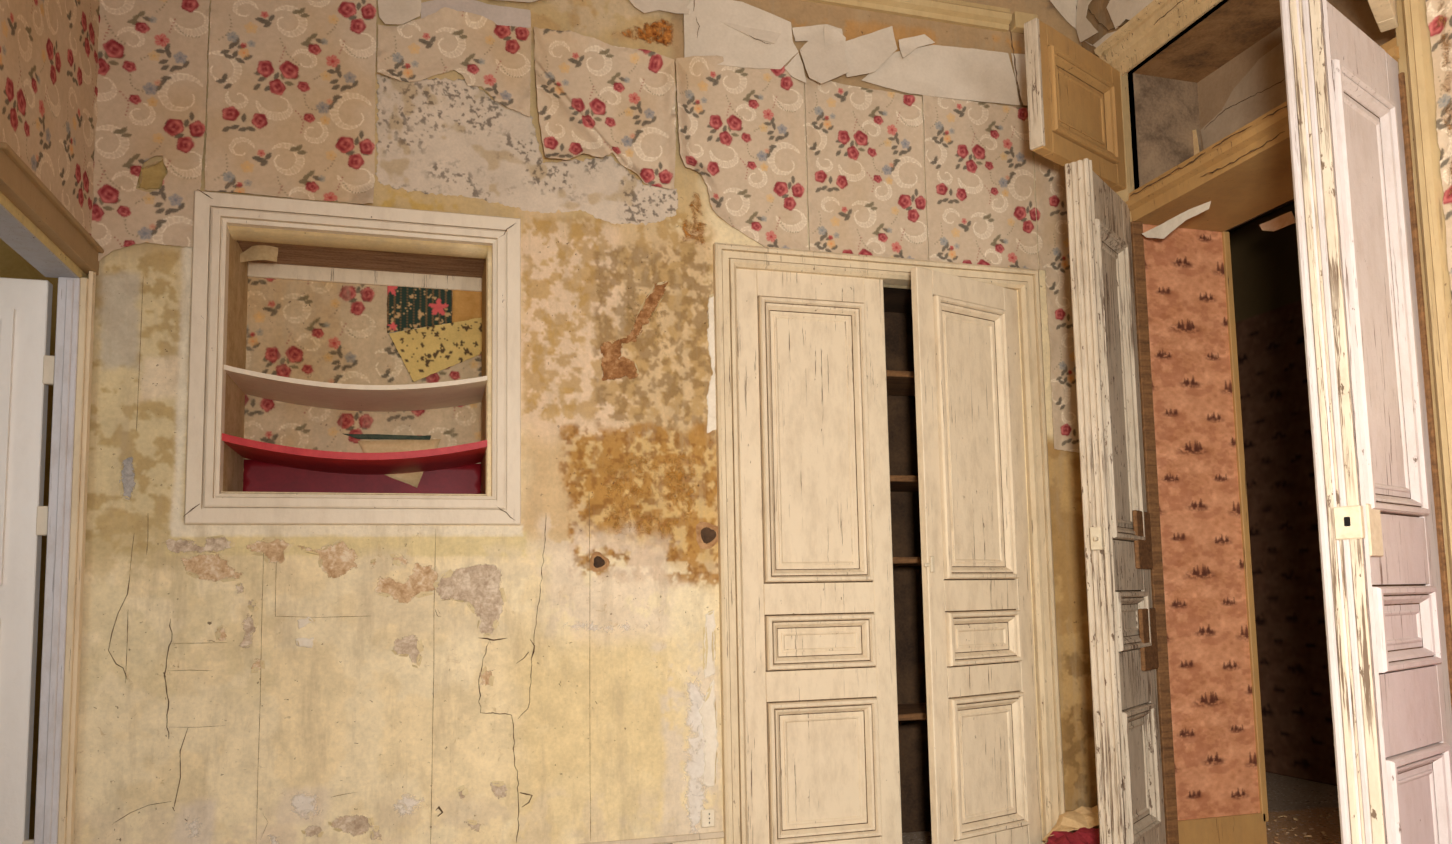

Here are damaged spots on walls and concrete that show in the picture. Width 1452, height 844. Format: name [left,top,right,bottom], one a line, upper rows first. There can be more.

peeling [629,0,691,14]
peeling [1050,0,1153,48]
flaking render [375,74,678,225]
damp [682,194,706,243]
crack [108,537,148,683]
crack [116,553,358,840]
spalling [162,535,507,673]
crack [478,507,561,843]